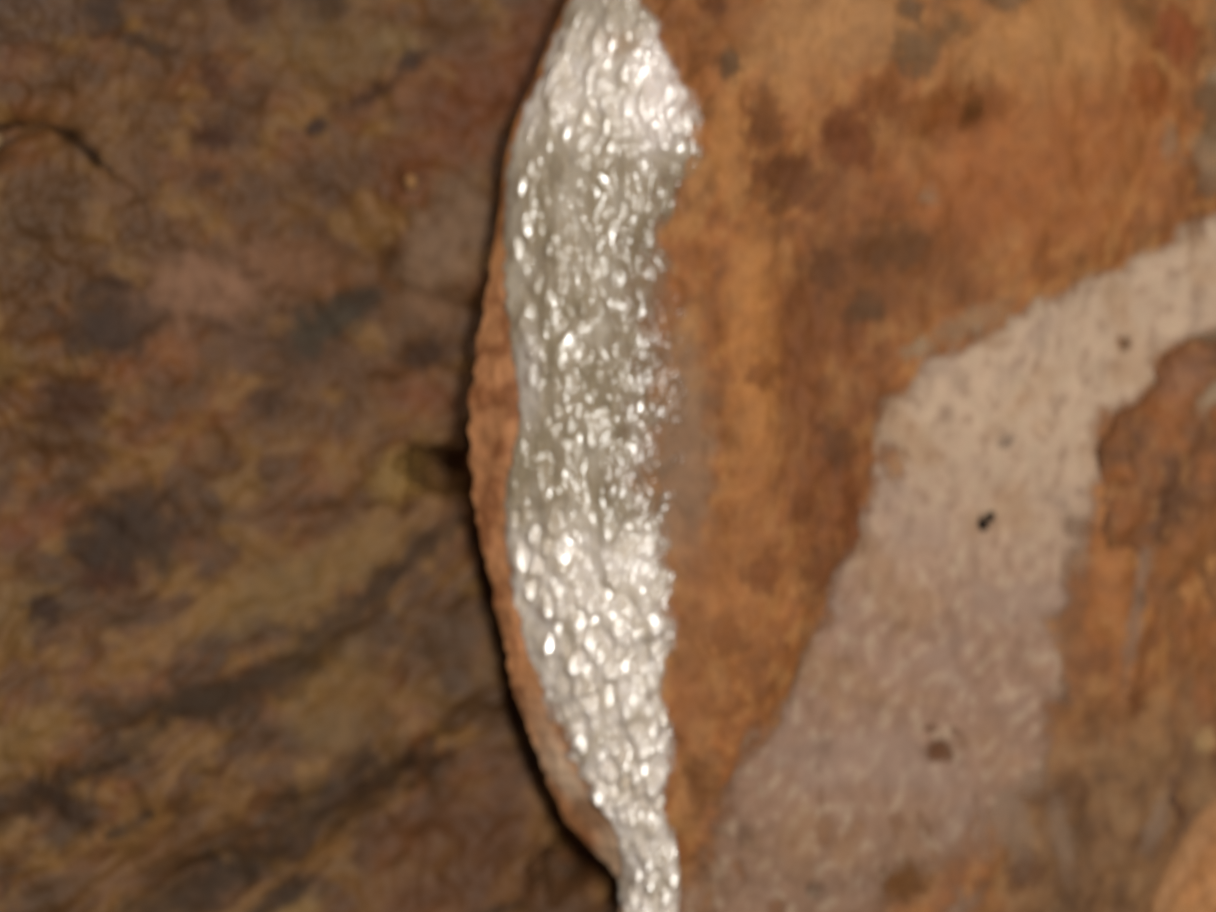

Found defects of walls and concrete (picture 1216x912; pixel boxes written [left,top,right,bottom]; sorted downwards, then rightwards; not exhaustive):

spalling [978,512,995,530]